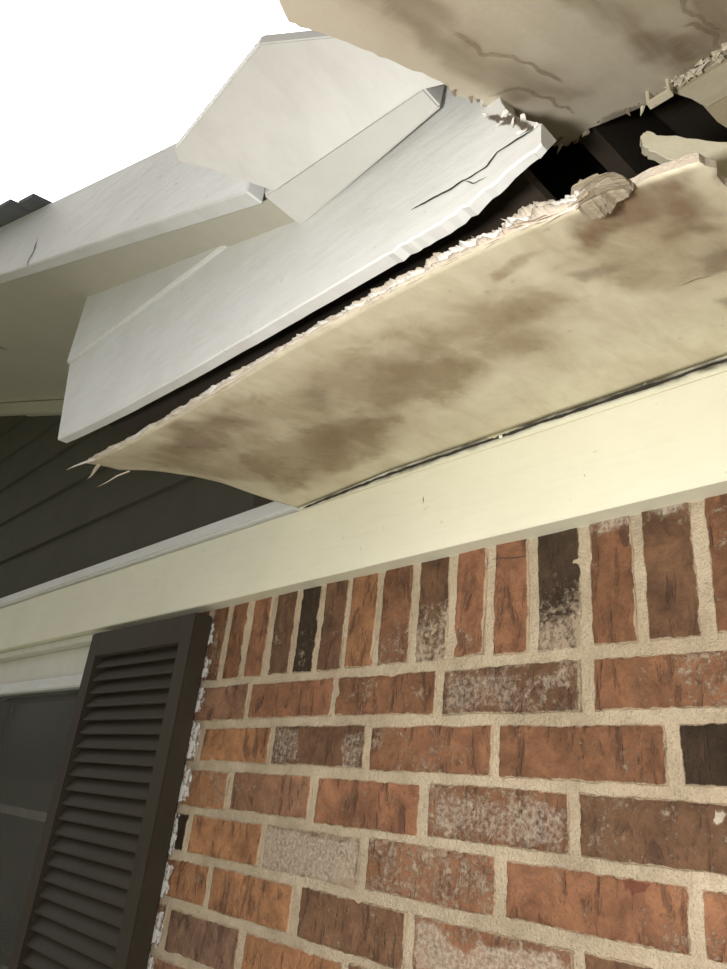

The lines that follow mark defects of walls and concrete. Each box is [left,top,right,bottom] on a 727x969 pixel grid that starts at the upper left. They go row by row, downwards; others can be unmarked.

peeling [482,109,542,136]
crack [411,130,533,210]
crack [304,358,727,508]
damp [520,376,671,429]